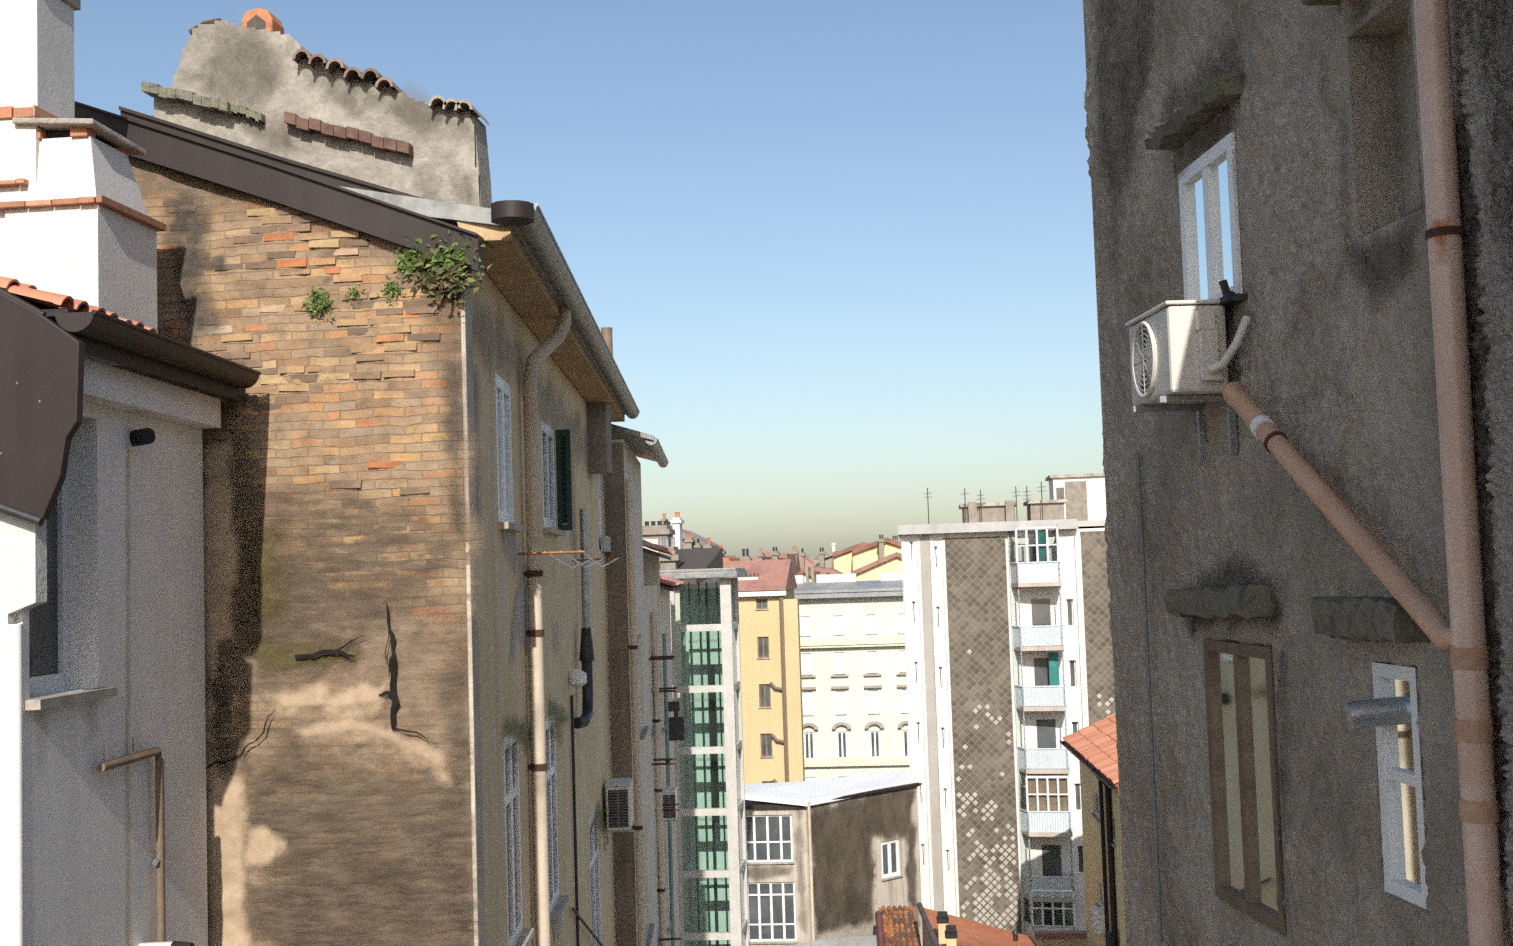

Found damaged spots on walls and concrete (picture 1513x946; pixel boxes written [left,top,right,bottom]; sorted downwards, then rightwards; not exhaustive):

water stain [246,497,441,670]
water stain [212,639,246,771]
crack [295,602,437,745]
water stain [244,671,469,946]